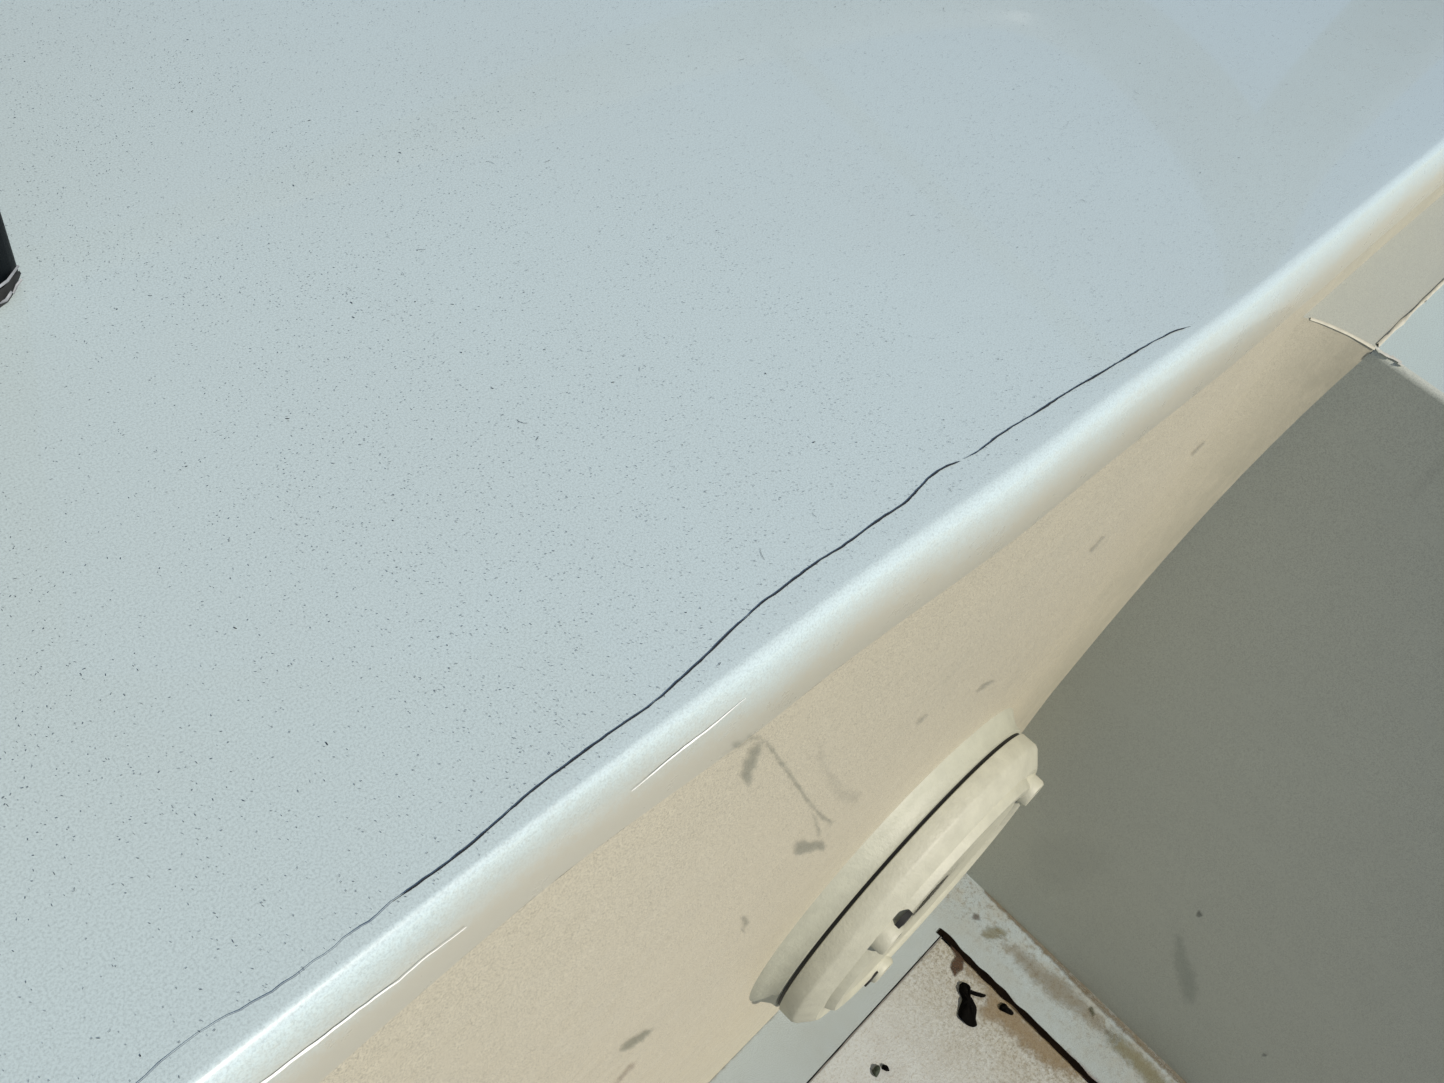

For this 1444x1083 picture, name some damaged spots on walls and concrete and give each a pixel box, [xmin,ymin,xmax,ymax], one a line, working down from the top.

crack [138,326,1191,1083]